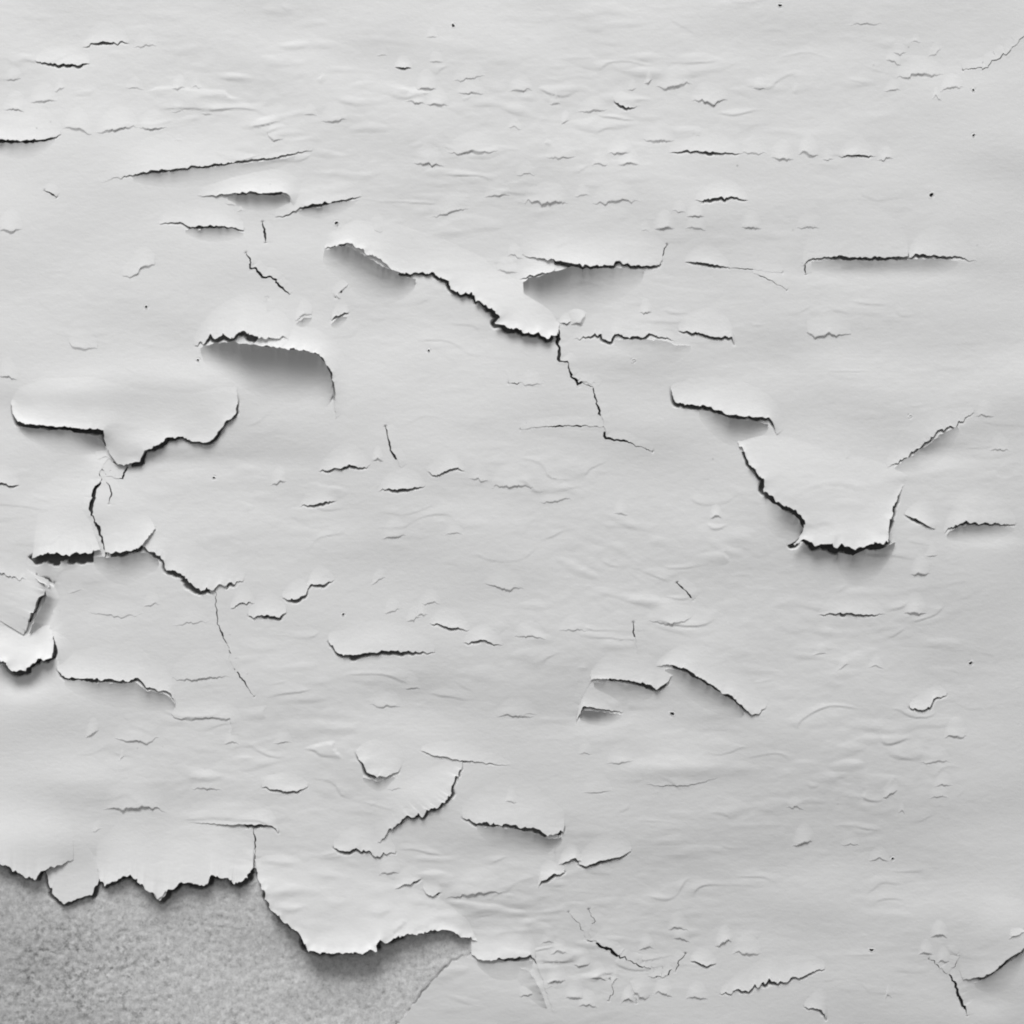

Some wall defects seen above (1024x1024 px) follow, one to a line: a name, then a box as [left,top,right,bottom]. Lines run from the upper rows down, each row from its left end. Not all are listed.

peeling [376,27,487,107]
peeling [591,120,894,167]
peeling [795,196,976,287]
peeling [0,64,768,761]
crack [509,320,655,455]
peeling [671,375,1015,616]
flaking render [0,738,673,1024]
crack [918,919,975,1016]